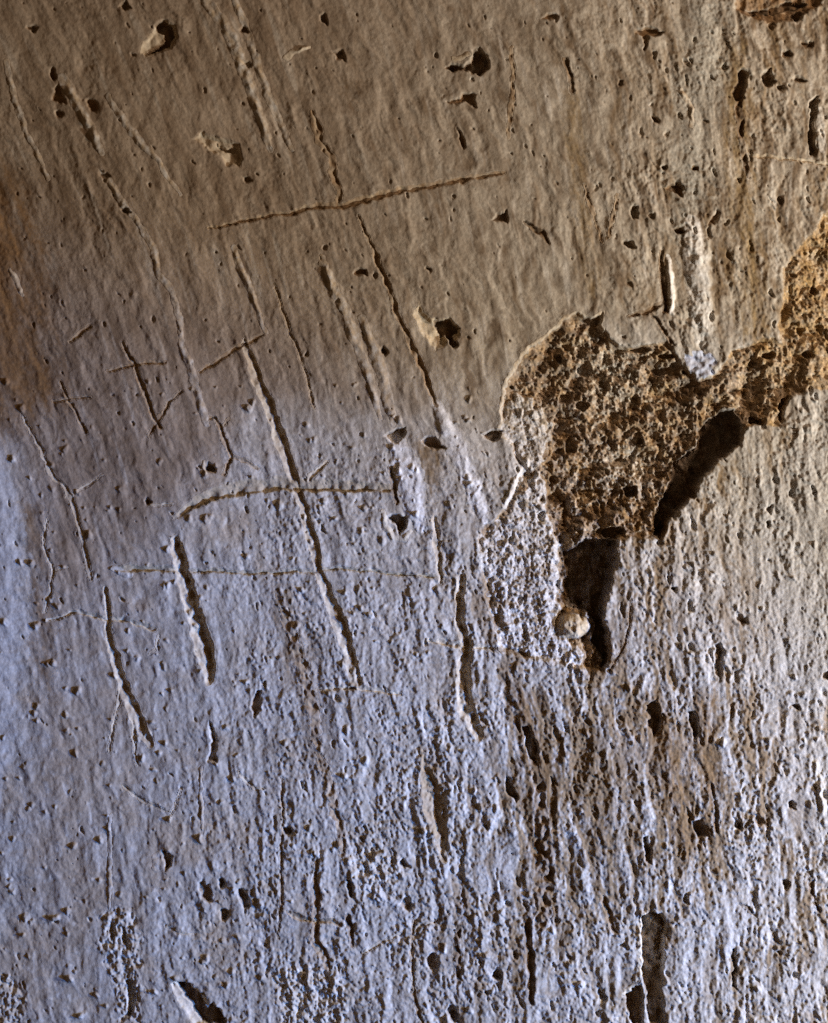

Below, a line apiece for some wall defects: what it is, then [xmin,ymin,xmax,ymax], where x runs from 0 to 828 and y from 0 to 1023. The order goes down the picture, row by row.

spalling [476,210,828,674]
spalling [714,643,725,681]